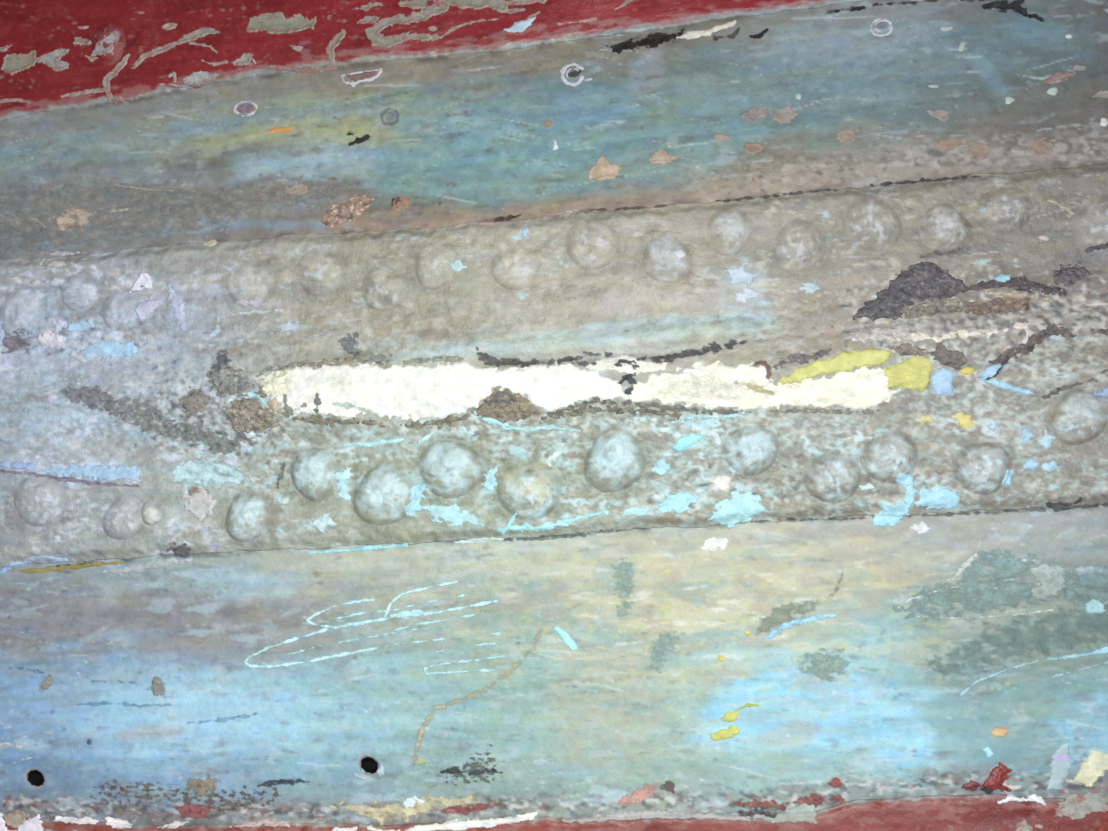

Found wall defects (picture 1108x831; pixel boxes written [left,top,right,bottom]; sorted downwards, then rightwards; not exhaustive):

peeling [0,26,139,76]
peeling [157,52,256,89]
peeling [246,12,317,51]
peeling [352,0,547,49]
peeling [846,242,1108,396]
spalling [178,355,751,475]
peeling [961,743,1108,820]
peeling [0,810,133,831]
peeling [157,804,212,829]
peeling [228,819,290,828]
peeling [329,793,538,831]
peeling [561,803,818,824]